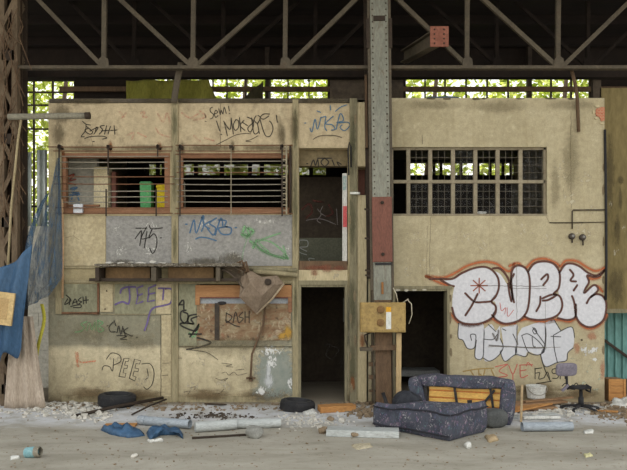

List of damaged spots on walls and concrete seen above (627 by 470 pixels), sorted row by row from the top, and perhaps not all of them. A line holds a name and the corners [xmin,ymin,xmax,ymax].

peeling [255,348,292,397]
leakage [76,389,102,398]
leakage [192,390,223,399]
leakage [250,391,281,399]